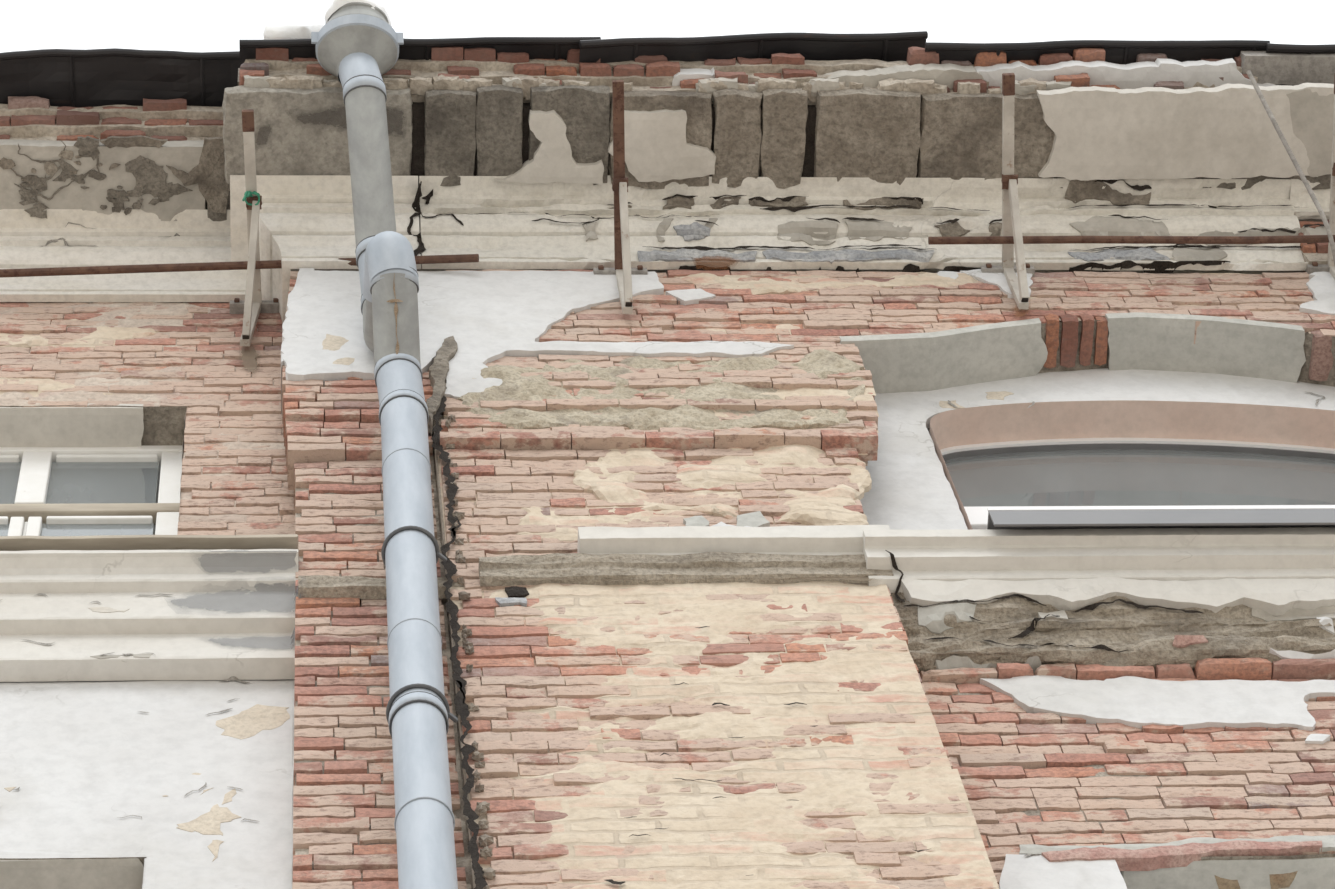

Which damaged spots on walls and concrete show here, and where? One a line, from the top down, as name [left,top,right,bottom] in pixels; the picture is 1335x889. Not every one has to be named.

spalling [0,135,230,218]
peeling [281,268,375,414]
spalling [417,83,1335,744]
spalling [298,575,387,599]
crack [426,336,496,889]
crack [885,550,1203,652]
peeling [207,676,290,739]
peeling [176,773,260,861]
spalling [1019,835,1335,889]